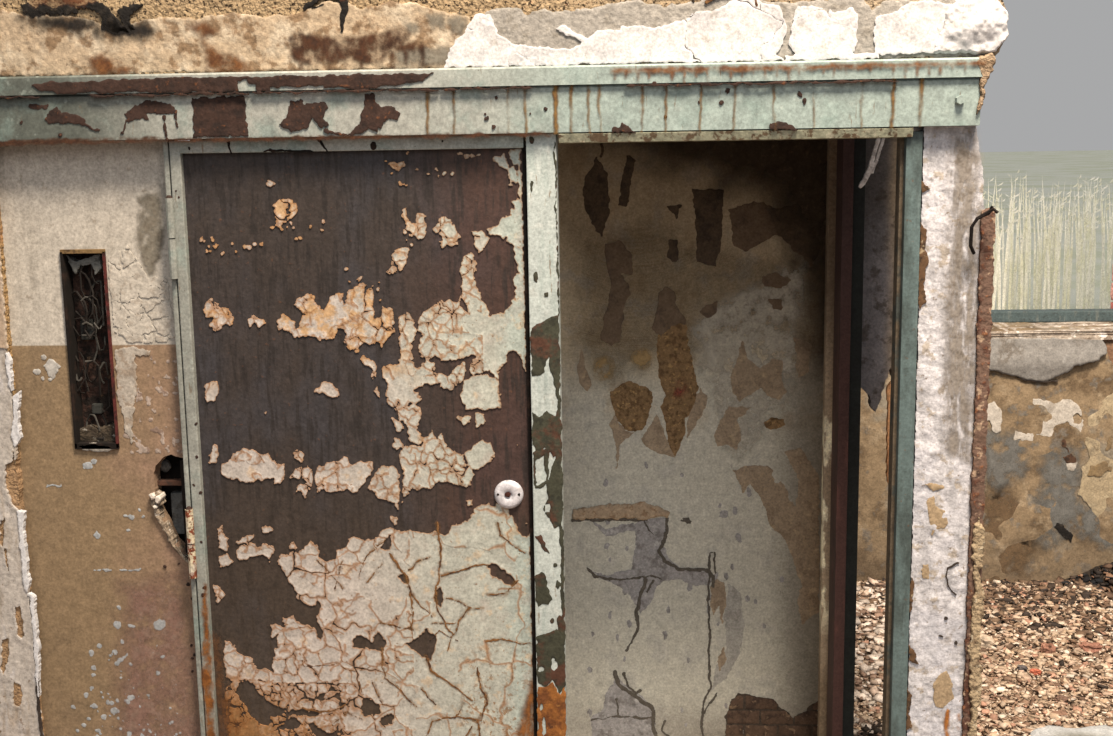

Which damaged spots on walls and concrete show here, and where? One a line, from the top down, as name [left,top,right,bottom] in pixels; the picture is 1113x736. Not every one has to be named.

peeling [203,298,234,332]
peeling [667,189,811,267]
flaking render [918,223,929,310]
peeling [0,252,44,736]
peeling [108,245,188,563]
peeling [208,136,757,736]
peeling [733,448,820,625]
peeling [1013,393,1113,517]
corrosion [186,582,215,736]
crack [302,522,531,736]
corrosion [518,681,567,736]
flaking render [724,693,818,736]